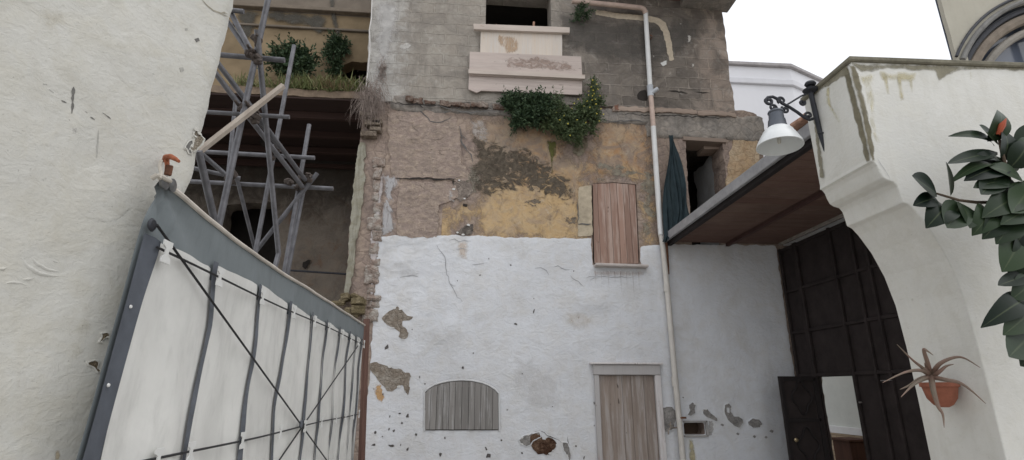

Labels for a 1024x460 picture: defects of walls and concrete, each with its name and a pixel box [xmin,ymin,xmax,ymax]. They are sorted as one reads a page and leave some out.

spalling [360,111,383,139]
water stain [814,64,1024,161]
water stain [466,137,573,206]
flaking render [362,157,413,340]
flaking render [456,224,473,235]
crack [437,239,484,301]
flaking render [370,362,426,395]
flaking render [663,397,773,439]
flaking render [518,431,585,460]